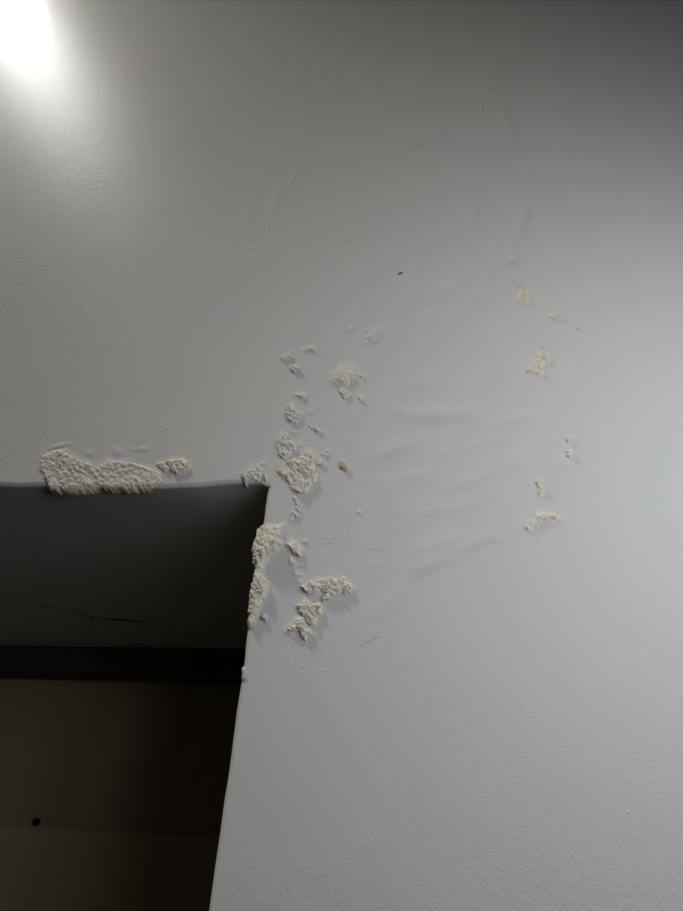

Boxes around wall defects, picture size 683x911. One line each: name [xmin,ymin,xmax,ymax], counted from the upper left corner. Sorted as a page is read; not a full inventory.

flaking render [36,447,193,496]
flaking render [236,389,326,629]
flaking render [281,575,356,647]